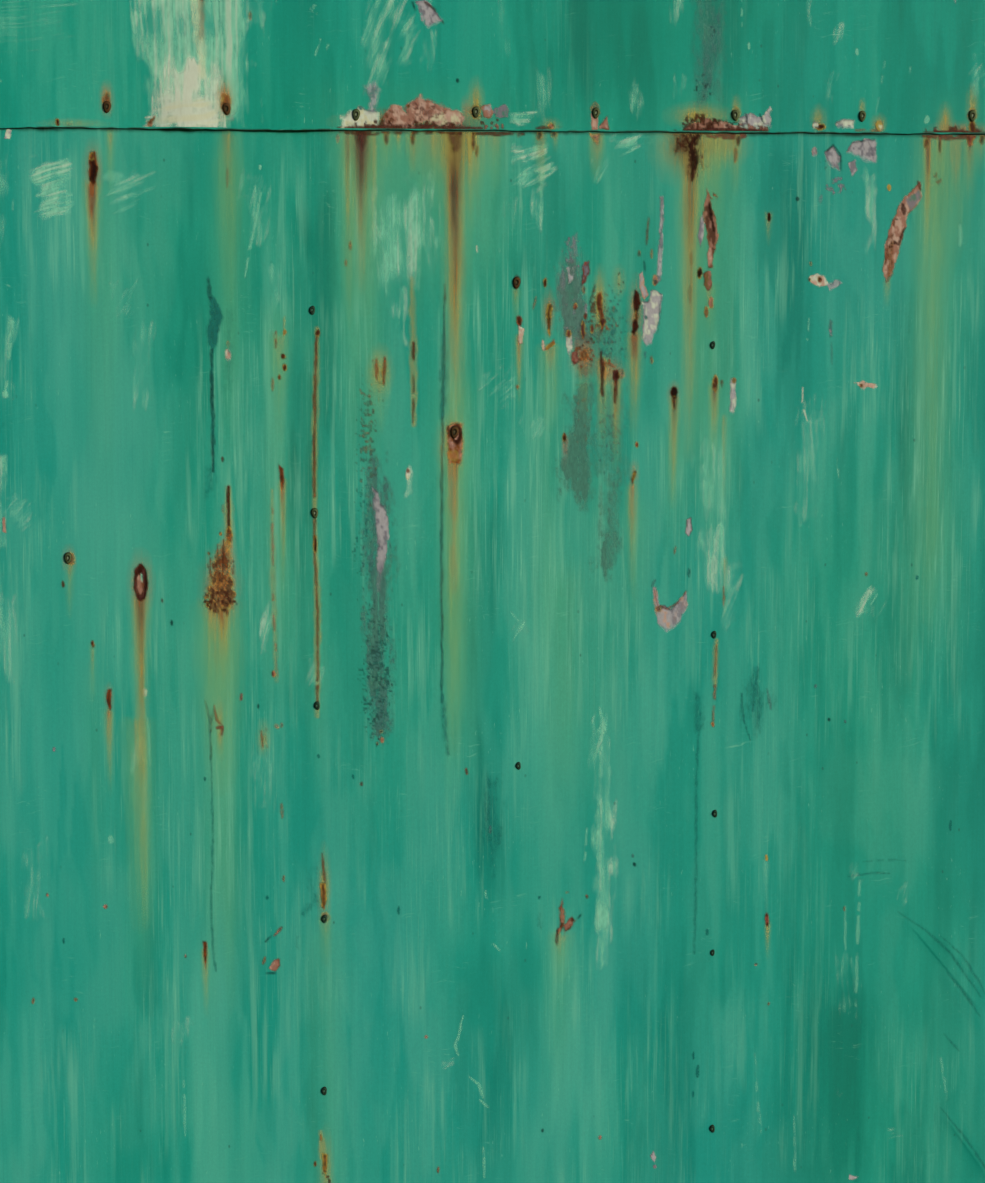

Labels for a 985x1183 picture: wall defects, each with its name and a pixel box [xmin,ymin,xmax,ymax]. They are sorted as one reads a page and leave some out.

peeling [339,86,483,129]
corrosion [345,99,555,320]
peeling [566,261,594,364]
peeling [639,197,664,344]
peeling [697,192,719,317]
corrosion [674,133,746,277]
peeling [883,182,922,279]
corrosion [134,564,148,689]
corrosion [204,486,236,646]
peeling [653,587,688,630]
corrosion [314,1136,331,1183]